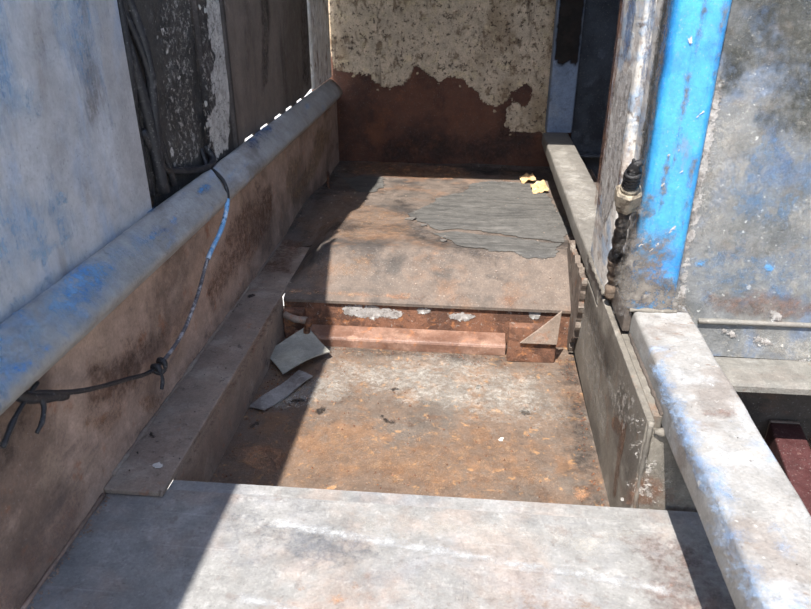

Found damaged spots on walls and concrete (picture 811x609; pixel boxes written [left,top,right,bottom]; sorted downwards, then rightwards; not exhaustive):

peeling [328,0,556,136]
peeling [404,181,571,259]